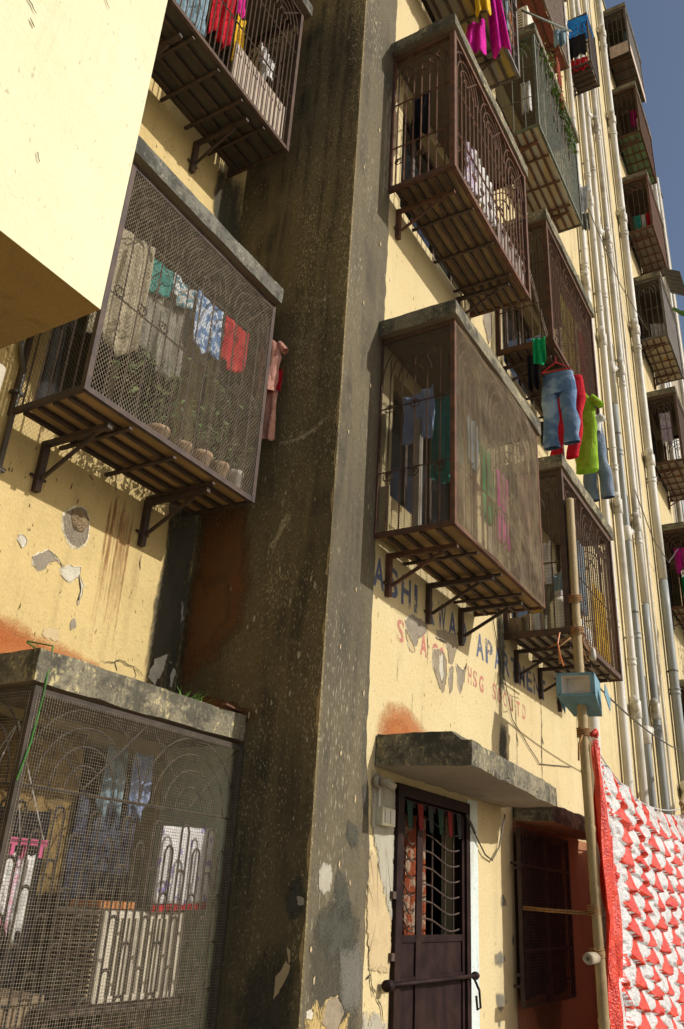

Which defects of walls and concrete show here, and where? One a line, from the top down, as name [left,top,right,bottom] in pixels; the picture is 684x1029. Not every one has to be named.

spalling [61,505,90,550]
corrosion [104,506,132,580]
peeling [16,534,85,641]
corrosion [0,621,94,665]
spalling [148,654,176,687]
corrosion [379,705,422,735]
peeling [307,829,340,895]
peeling [273,923,315,999]
peeling [305,995,349,1029]
peeling [362,1011,387,1029]